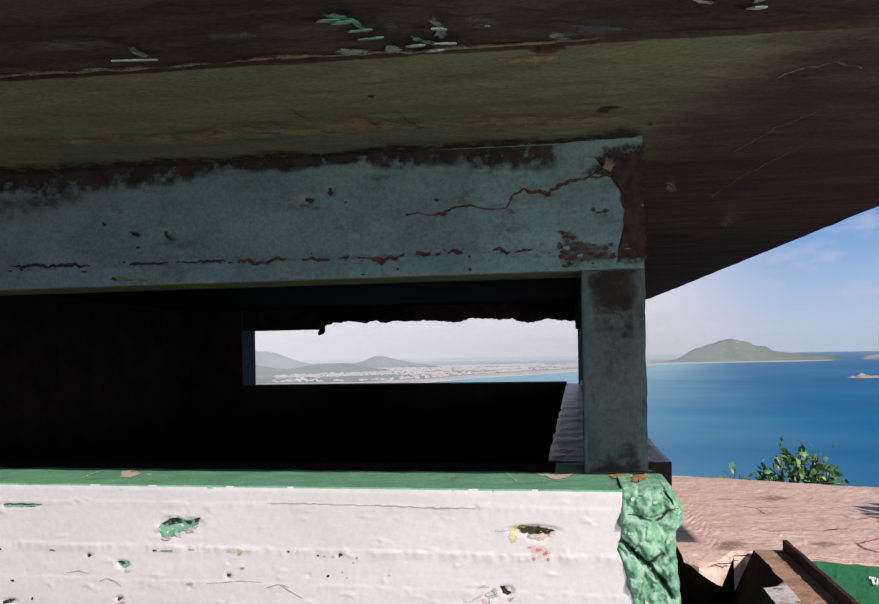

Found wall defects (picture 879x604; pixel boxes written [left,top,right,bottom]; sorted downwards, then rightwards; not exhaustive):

peeling [0,47,208,78]
peeling [230,14,598,63]
water stain [0,129,637,203]
crack [406,166,618,216]
spalling [152,515,200,552]
spalling [495,525,556,543]